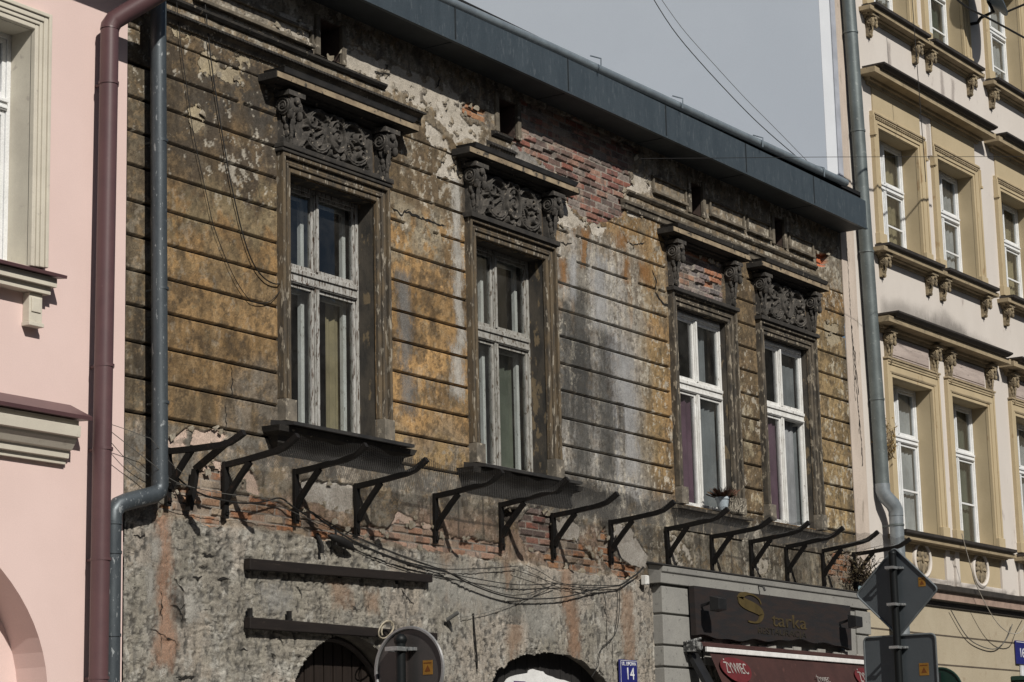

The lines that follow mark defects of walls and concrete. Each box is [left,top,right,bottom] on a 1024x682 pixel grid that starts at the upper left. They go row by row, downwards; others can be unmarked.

peeling [198,50,250,87]
peeling [188,103,206,133]
peeling [327,45,483,180]
flaking render [511,100,652,236]
flaking render [678,251,722,302]
damp [564,258,638,528]
peeling [168,425,224,448]
flaking render [156,459,503,561]
flaking render [504,507,647,580]